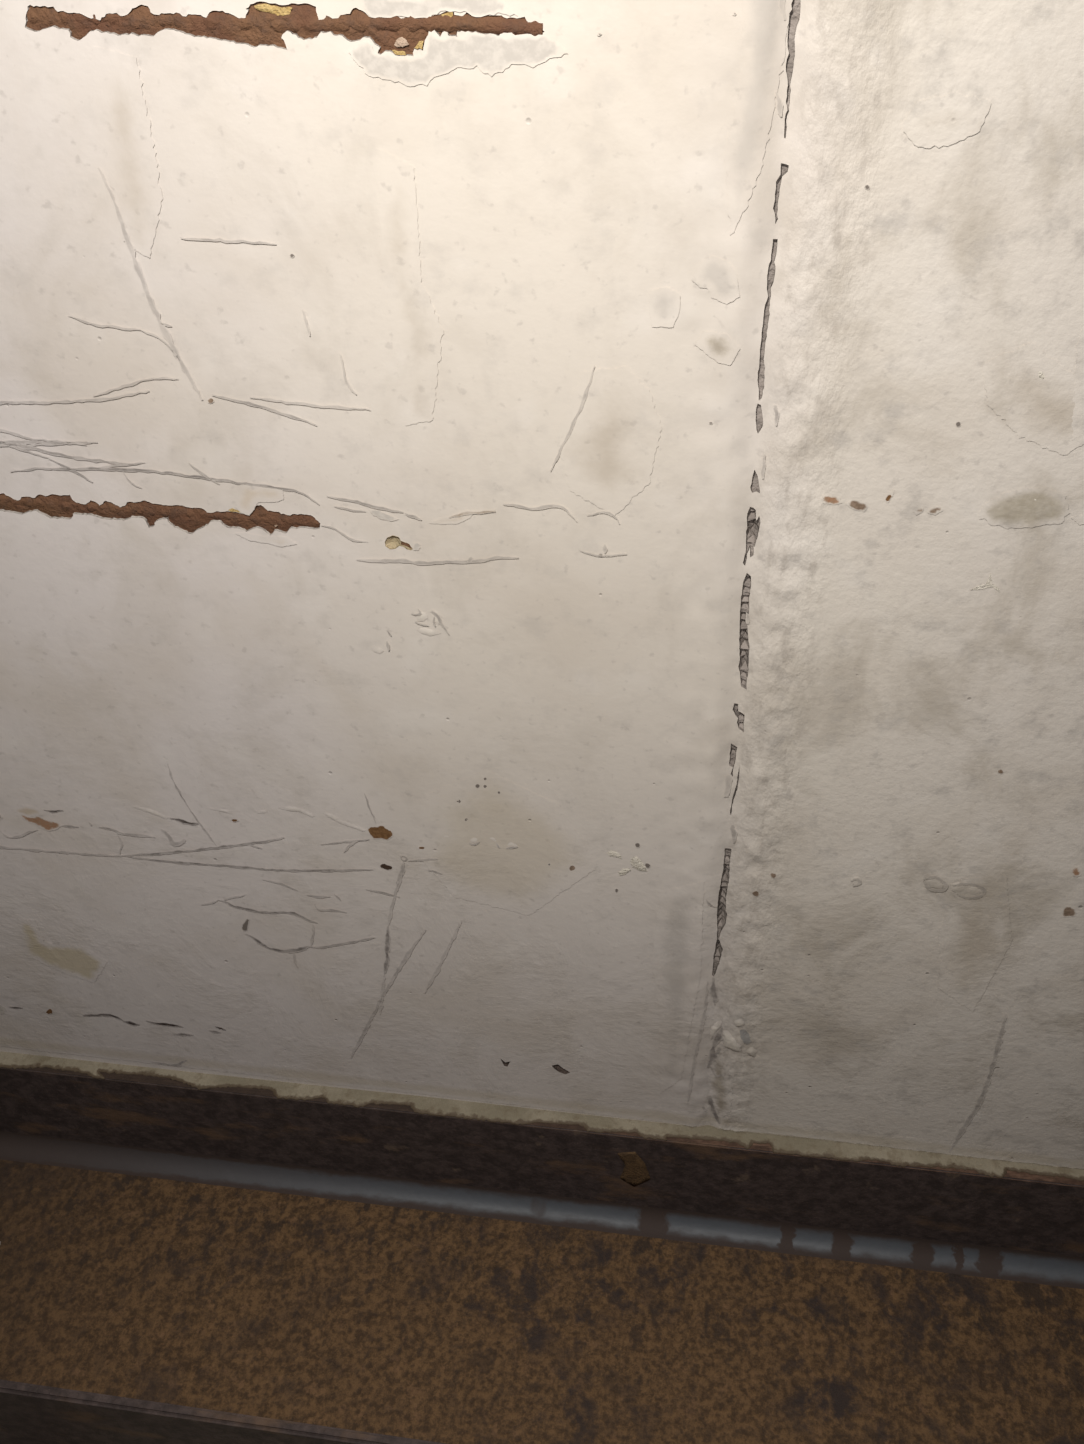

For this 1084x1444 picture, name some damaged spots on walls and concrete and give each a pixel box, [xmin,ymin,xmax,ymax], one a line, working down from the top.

crack [687,0,800,1124]
leakage [979,488,1070,529]